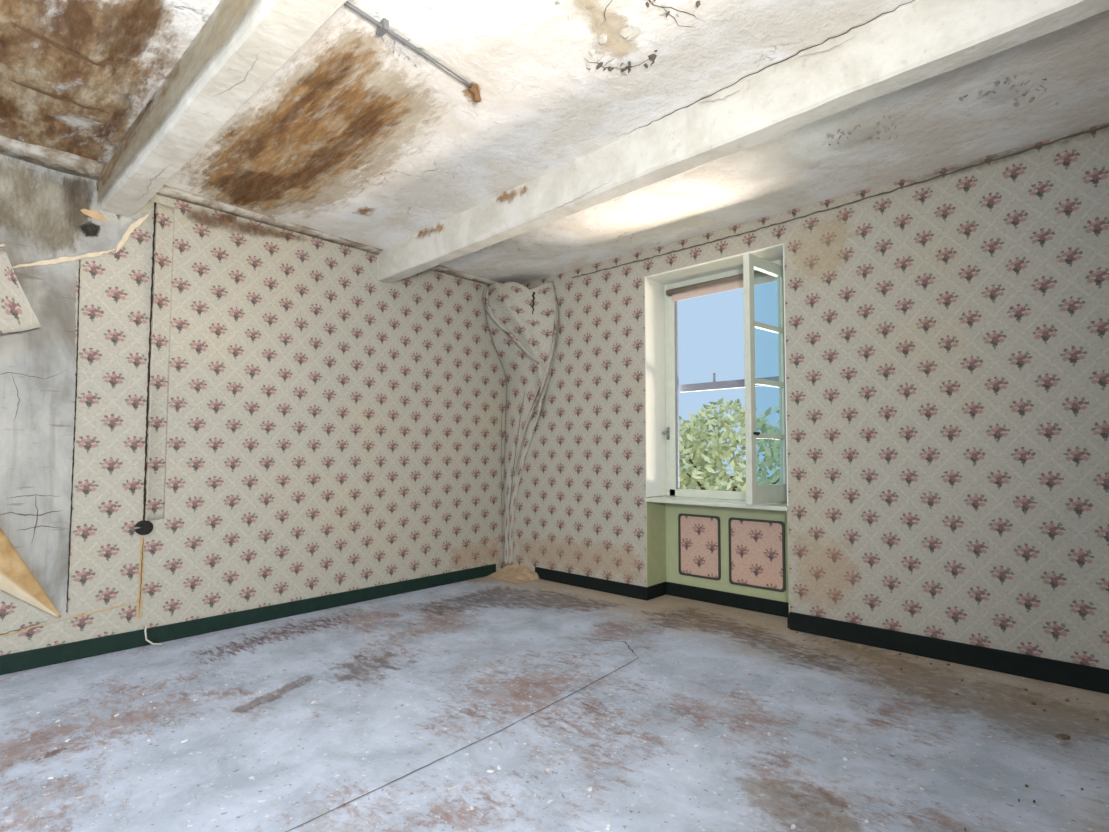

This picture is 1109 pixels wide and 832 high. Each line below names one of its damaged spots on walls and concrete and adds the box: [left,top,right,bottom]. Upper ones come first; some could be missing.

damp [0,0,254,251]
damp [192,30,433,239]
peeling [555,0,641,73]
flaking render [0,154,148,619]